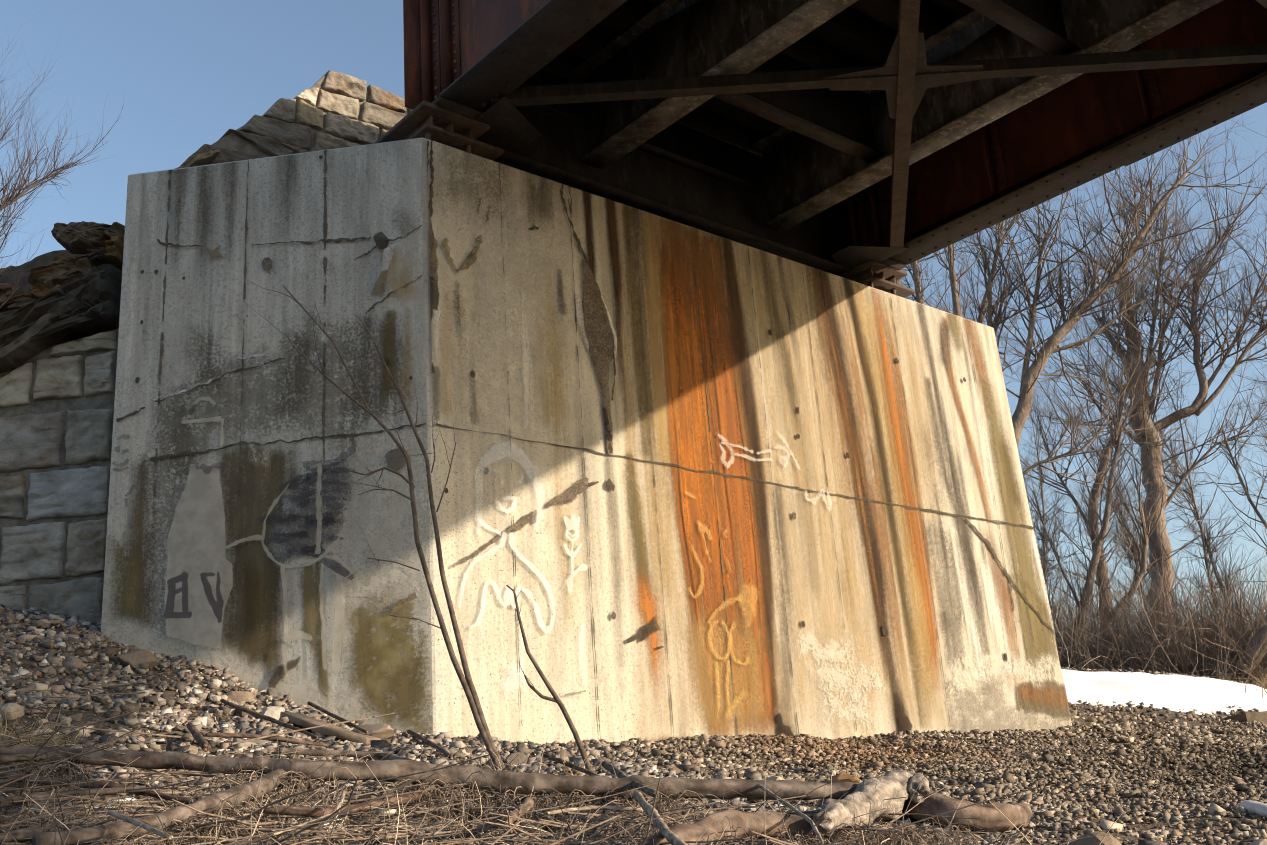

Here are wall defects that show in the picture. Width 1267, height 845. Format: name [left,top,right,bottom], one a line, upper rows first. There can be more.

damp [101,239,382,724]
crack [560,184,616,401]
rust [619,206,938,736]
damp [799,268,921,725]
damp [918,303,1071,718]